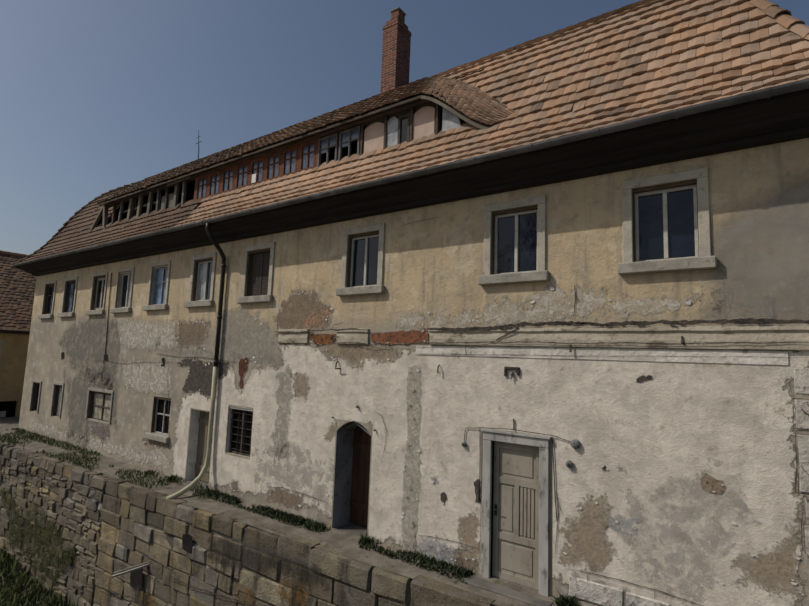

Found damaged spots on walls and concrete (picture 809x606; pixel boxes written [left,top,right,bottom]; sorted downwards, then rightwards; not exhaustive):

flaking render [121,289,334,516]
corrosion [238,357,249,389]
flaking render [323,342,400,369]
peeling [395,283,701,342]
flaking render [448,479,481,568]
flaking render [557,472,806,606]